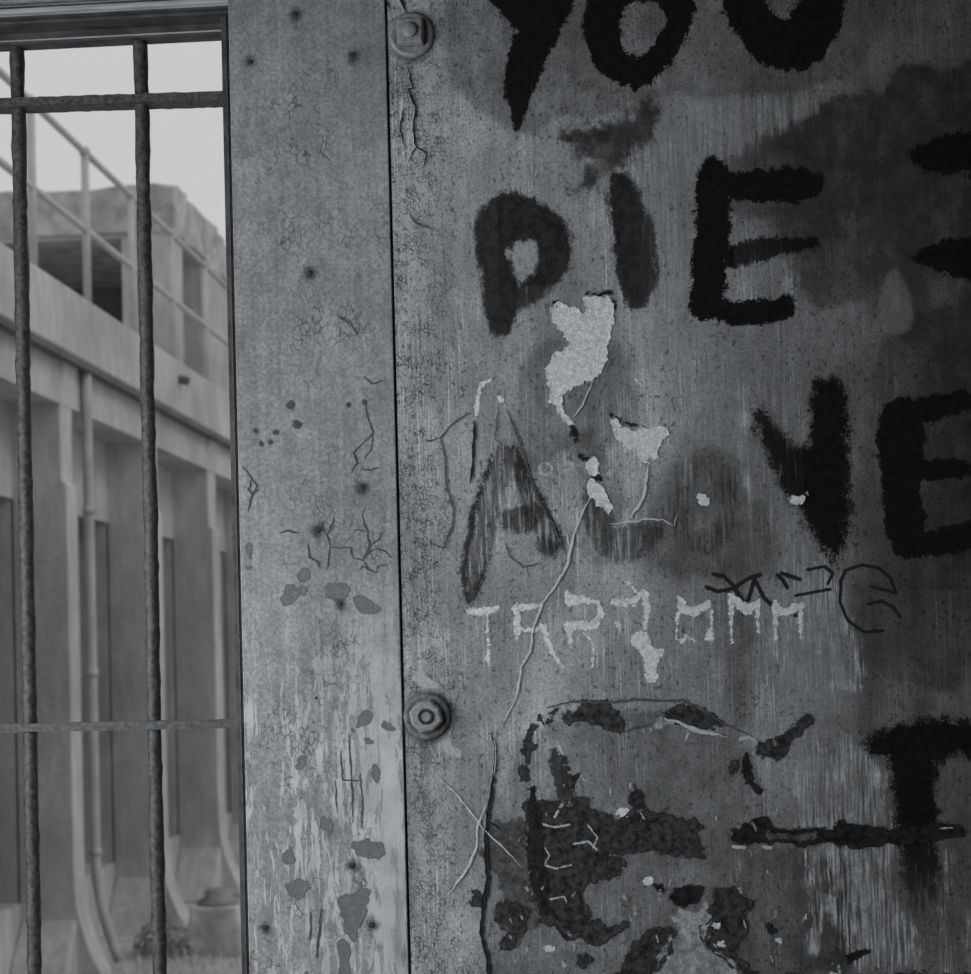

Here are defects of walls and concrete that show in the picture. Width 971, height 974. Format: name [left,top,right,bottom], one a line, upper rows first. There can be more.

damp [661,64,971,304]
crack [351,376,385,473]
flaking render [544,290,617,515]
crack [574,357,613,417]
flaking render [609,413,670,465]
crack [610,465,677,526]
crack [279,508,391,573]
crack [546,697,752,737]
peeling [726,713,814,798]
peeling [463,740,707,969]
peeling [730,807,965,855]
flaking render [612,876,758,974]